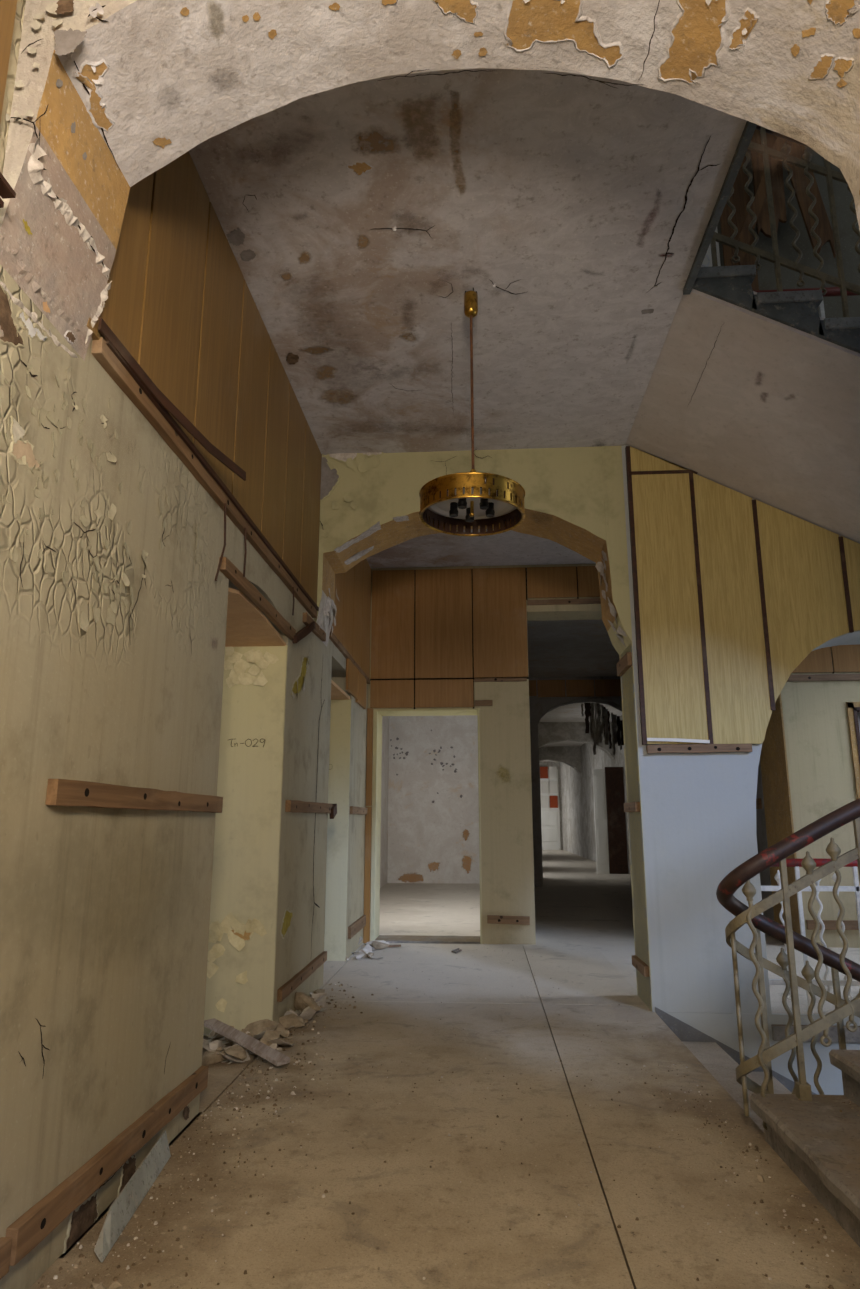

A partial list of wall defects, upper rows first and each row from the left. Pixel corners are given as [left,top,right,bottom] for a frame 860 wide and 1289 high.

peeling [30,0,115,133]
peeling [242,12,277,39]
peeling [432,0,487,56]
peeling [503,0,626,69]
peeling [657,0,760,88]
peeling [791,0,860,57]
peeling [808,53,854,88]
water stain [358,92,464,193]
crack [646,136,719,293]
peeling [224,647,279,688]